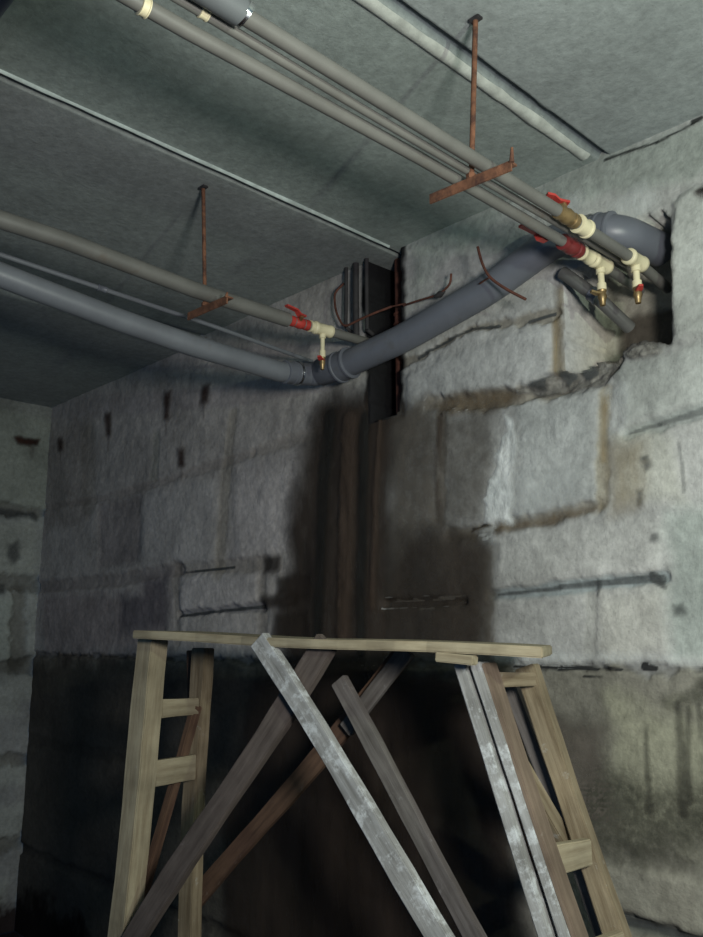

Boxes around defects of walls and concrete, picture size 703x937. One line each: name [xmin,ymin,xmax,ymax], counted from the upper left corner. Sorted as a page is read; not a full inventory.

spalling [626,342,659,359]
spalling [516,363,619,396]